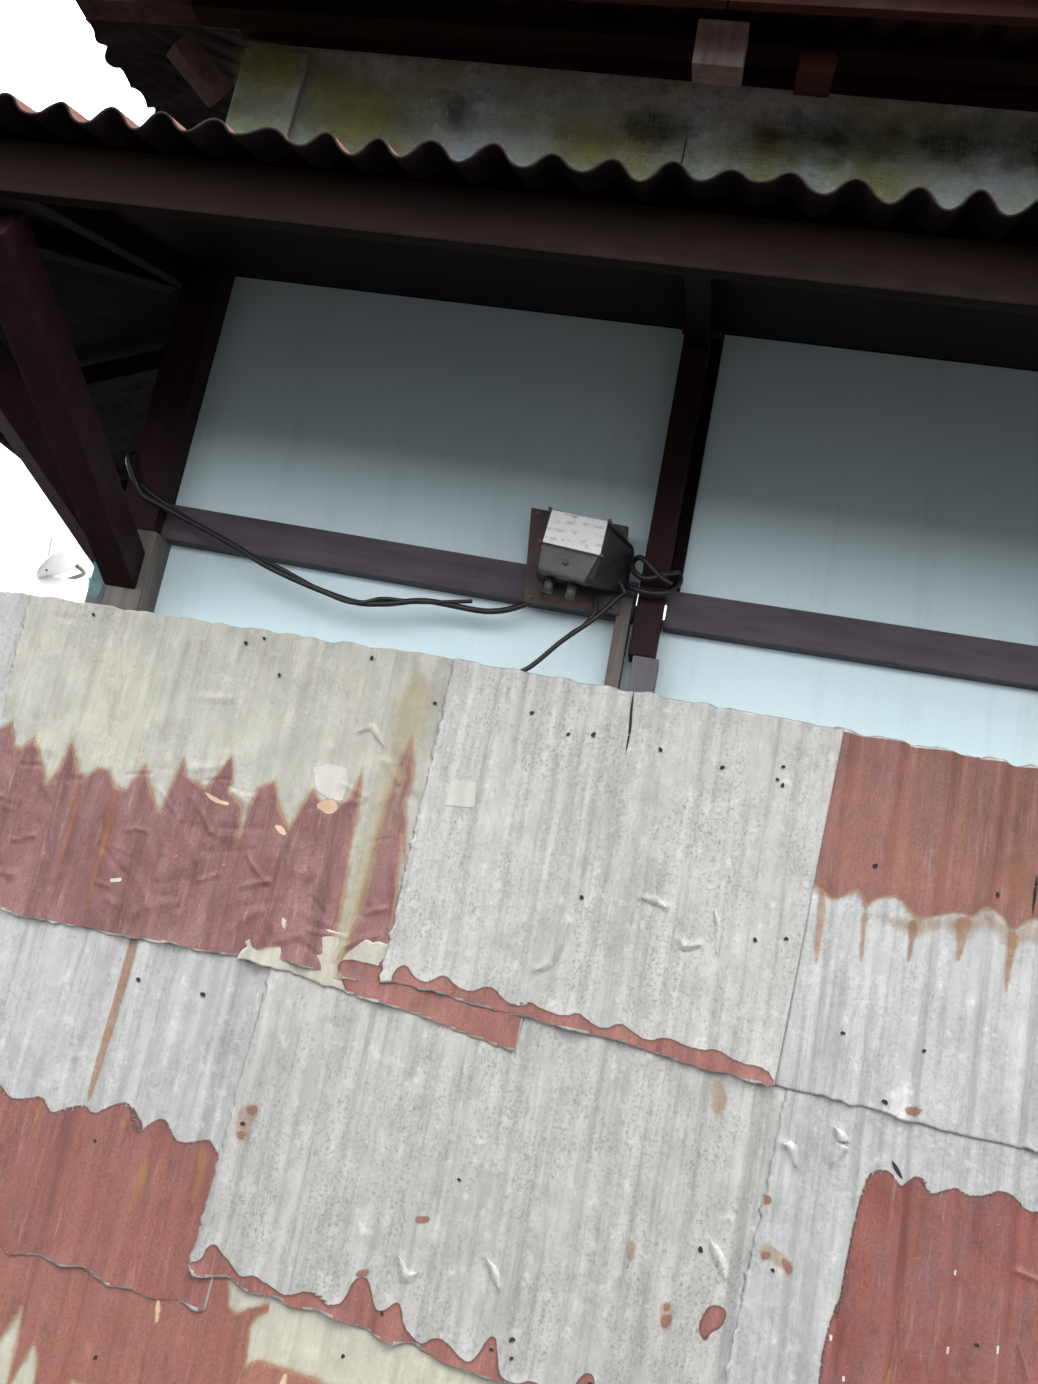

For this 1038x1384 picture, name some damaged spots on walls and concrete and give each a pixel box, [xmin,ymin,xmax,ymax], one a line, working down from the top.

water stain [758,120,1038,158]
water stain [931,171,1038,199]
peeling [0,722,774,1085]
corrosion [908,922,920,958]
corrosion [953,918,970,958]
corrosion [1006,932,1016,987]
corrosion [91,939,137,1085]
peeling [0,1085,538,1384]
peeling [818,1170,1038,1384]
peeling [576,1373,595,1384]